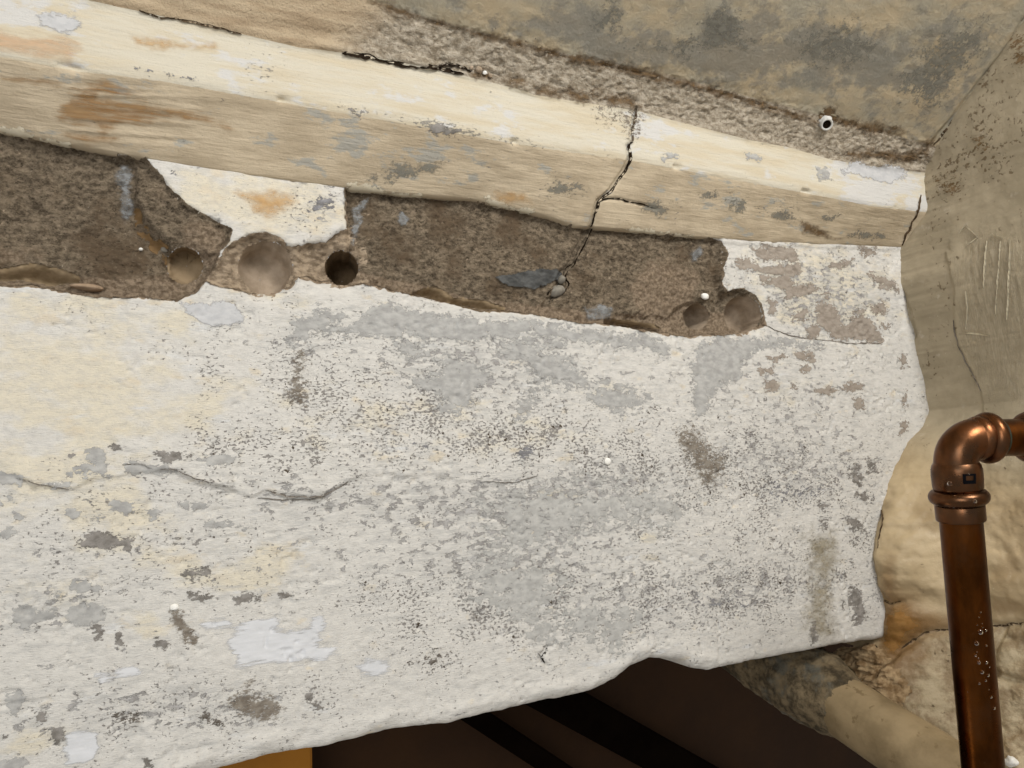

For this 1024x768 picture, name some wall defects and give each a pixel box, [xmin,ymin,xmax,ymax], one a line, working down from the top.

crack [343,51,471,75]
crack [547,108,652,302]
crack [902,195,922,246]
spalling [0,126,907,423]
peeling [897,392,909,436]
crack [125,464,208,482]
crack [263,482,348,501]